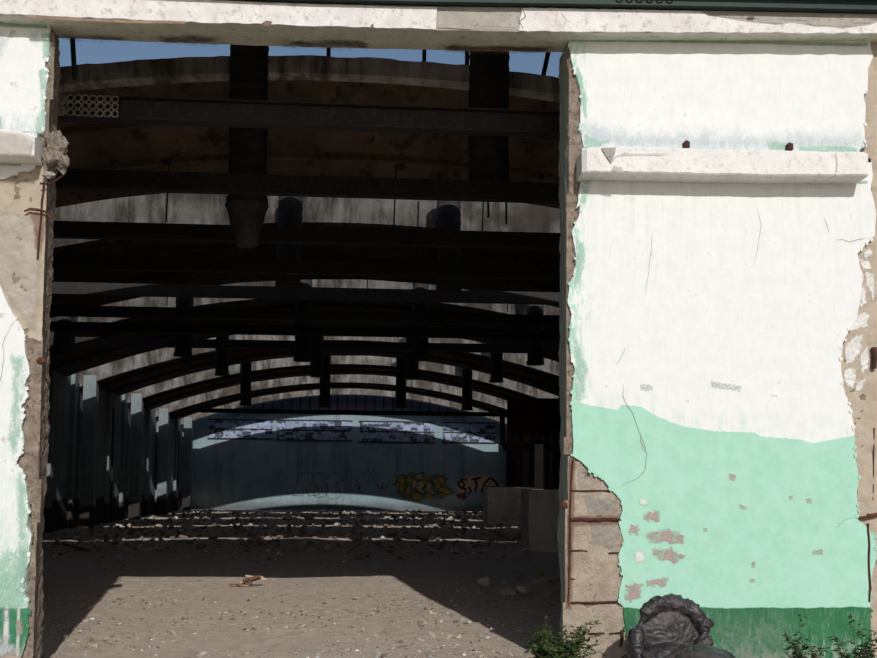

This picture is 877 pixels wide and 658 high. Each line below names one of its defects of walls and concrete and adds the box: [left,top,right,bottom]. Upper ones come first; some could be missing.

spalling [0,163,63,658]
crack [621,397,647,487]
spalling [563,40,877,658]